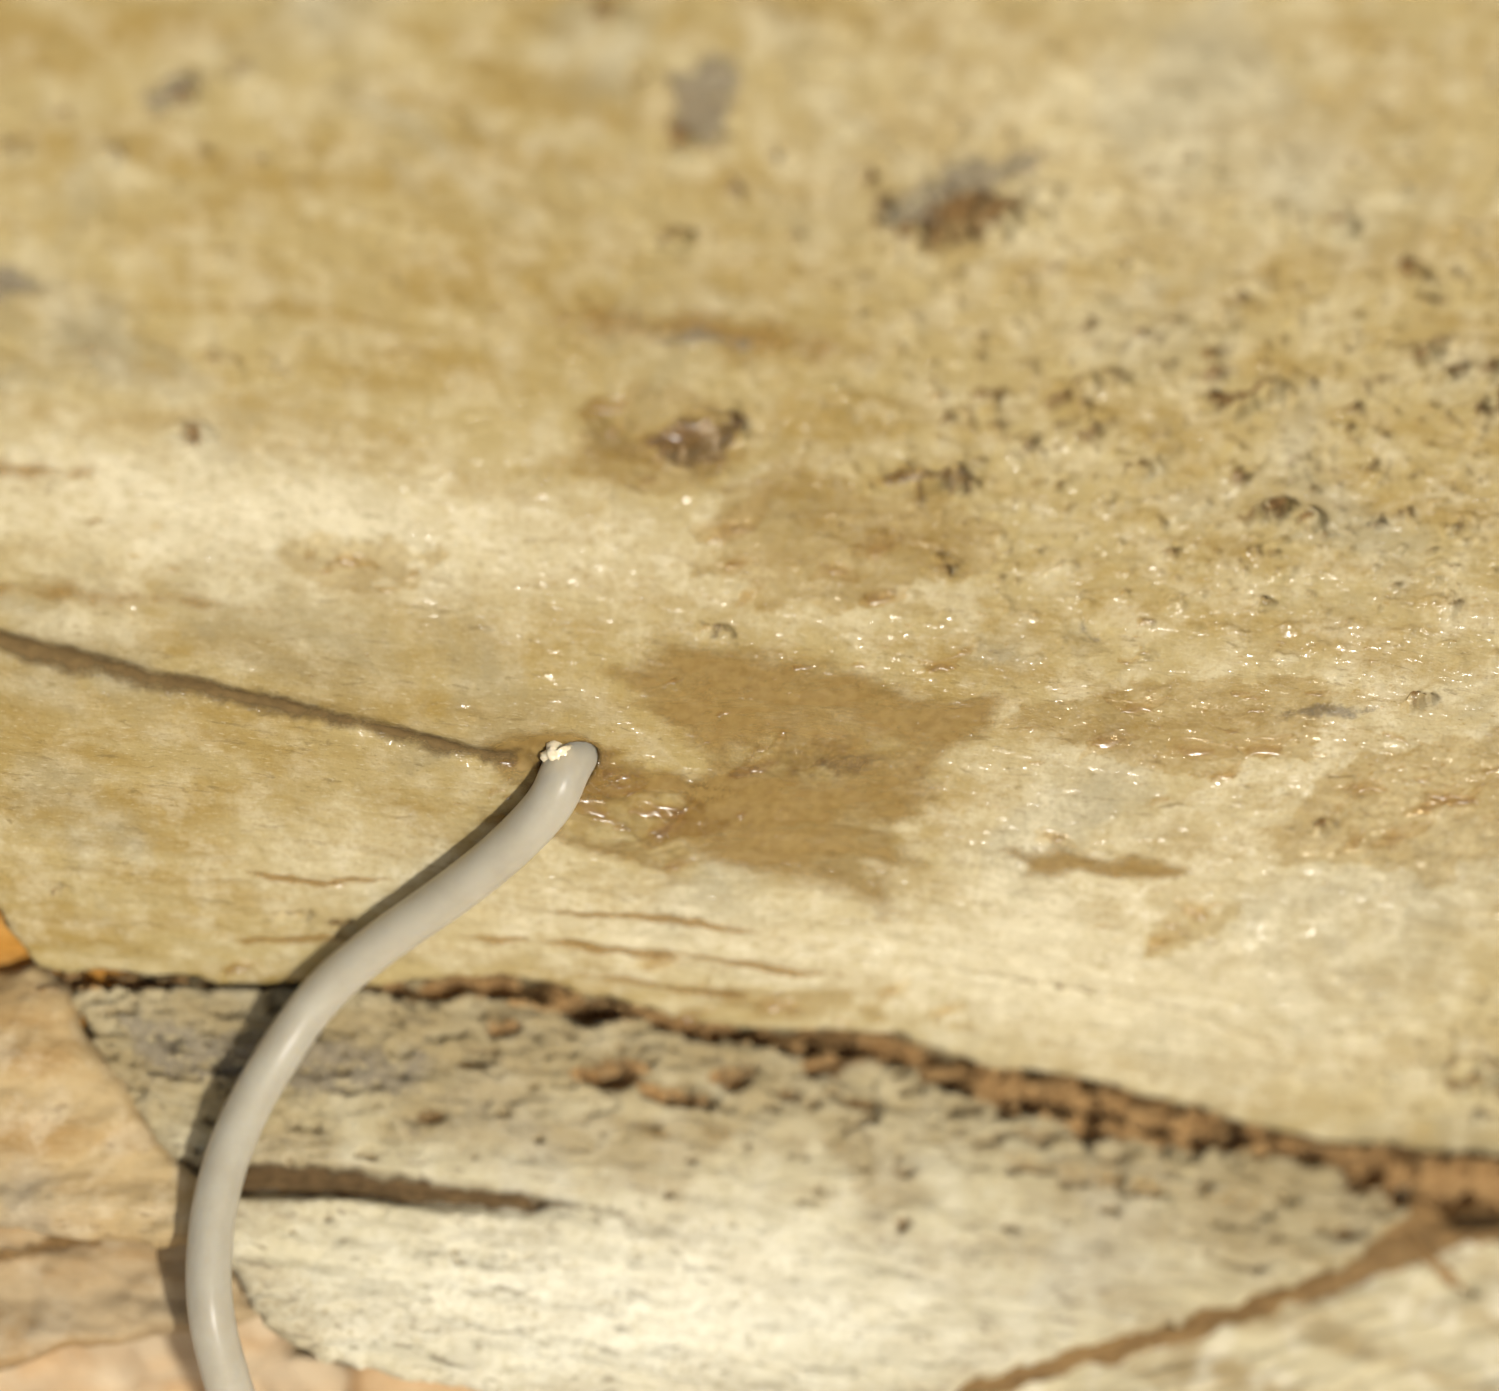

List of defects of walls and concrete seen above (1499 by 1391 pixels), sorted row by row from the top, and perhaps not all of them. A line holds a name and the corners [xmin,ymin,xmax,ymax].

crack [0,630,515,763]
damp [491,649,994,882]